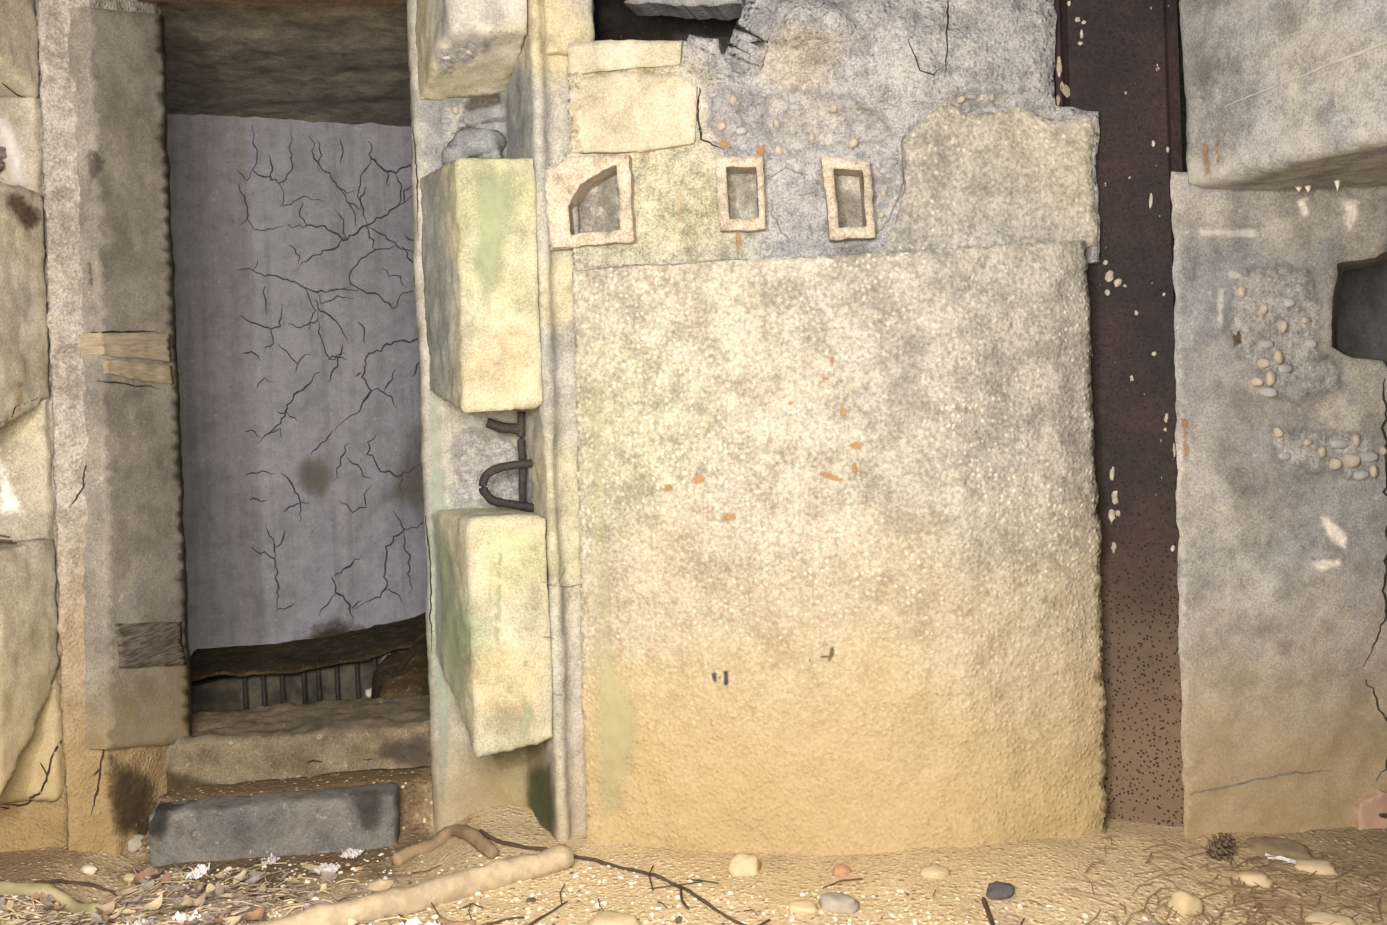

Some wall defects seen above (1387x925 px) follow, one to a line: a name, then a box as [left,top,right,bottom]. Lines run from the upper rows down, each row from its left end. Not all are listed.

spalling [707,88,747,142]
spalling [764,89,891,159]
crack [91,327,159,335]
spalling [1228,265,1346,402]
crack [97,380,160,389]
crack [237,124,432,651]
spalling [1271,427,1387,480]
crack [1364,379,1387,722]
crack [1190,770,1329,796]